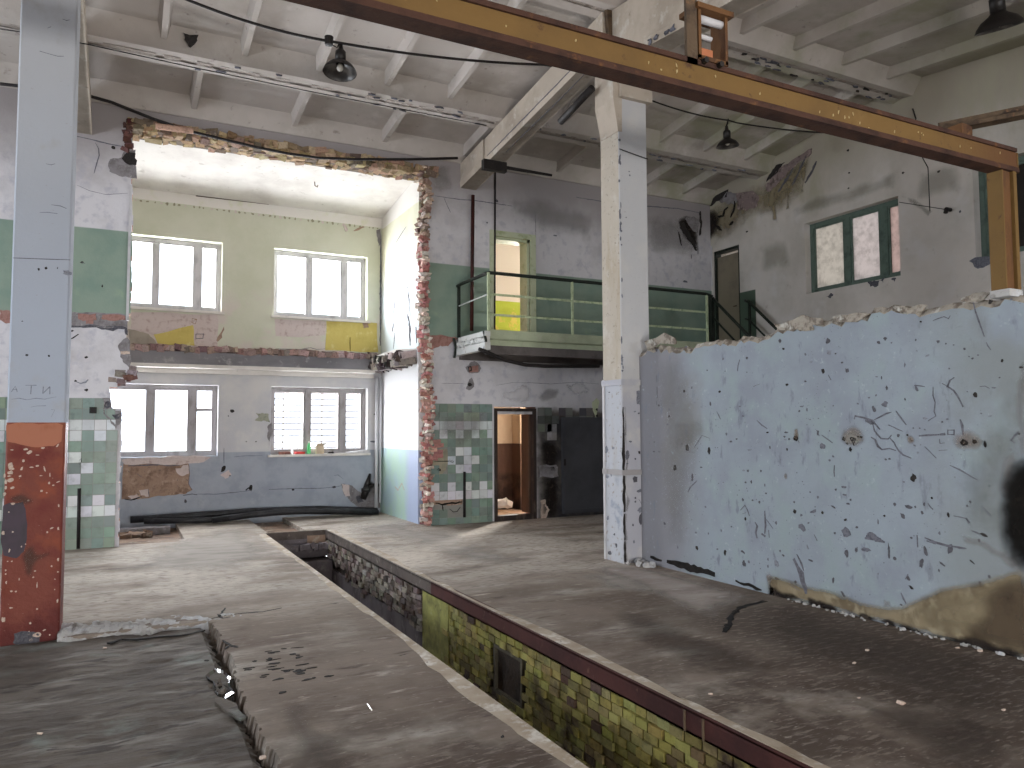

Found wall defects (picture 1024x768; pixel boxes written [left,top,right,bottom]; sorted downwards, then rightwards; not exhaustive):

flaking render [108,118,137,179]
flaking render [710,148,817,286]
spalling [414,166,463,526]
flaking render [122,455,210,503]
rust [842,434,863,452]
crack [854,377,964,458]
water stain [769,463,1024,657]
crack [107,608,280,669]